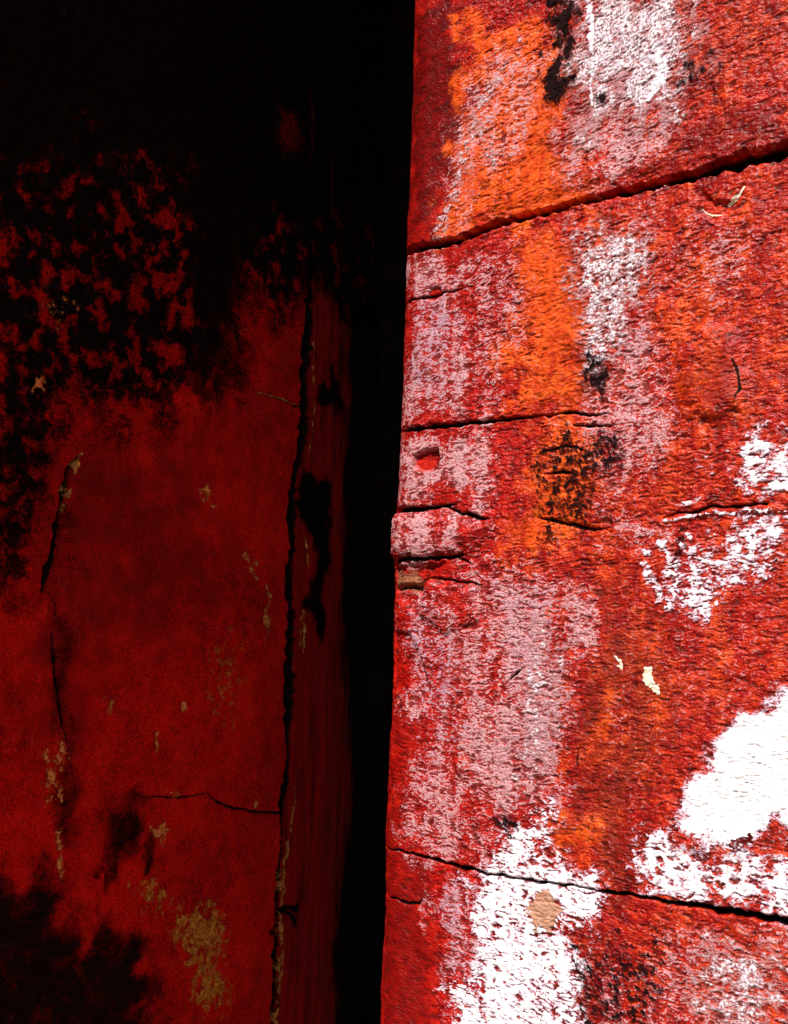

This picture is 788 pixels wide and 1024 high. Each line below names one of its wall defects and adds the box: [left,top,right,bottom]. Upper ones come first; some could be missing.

crack [40,452,83,591]
crack [403,504,490,520]
crack [538,517,607,531]
crack [540,424,615,475]
crack [50,635,66,740]
crack [134,239,316,1024]
spalling [643,666,660,695]
peeling [435,600,609,1024]
peeling [626,682,788,927]
leakage [0,855,164,1024]
flaking render [128,878,233,1019]
crack [390,896,423,904]